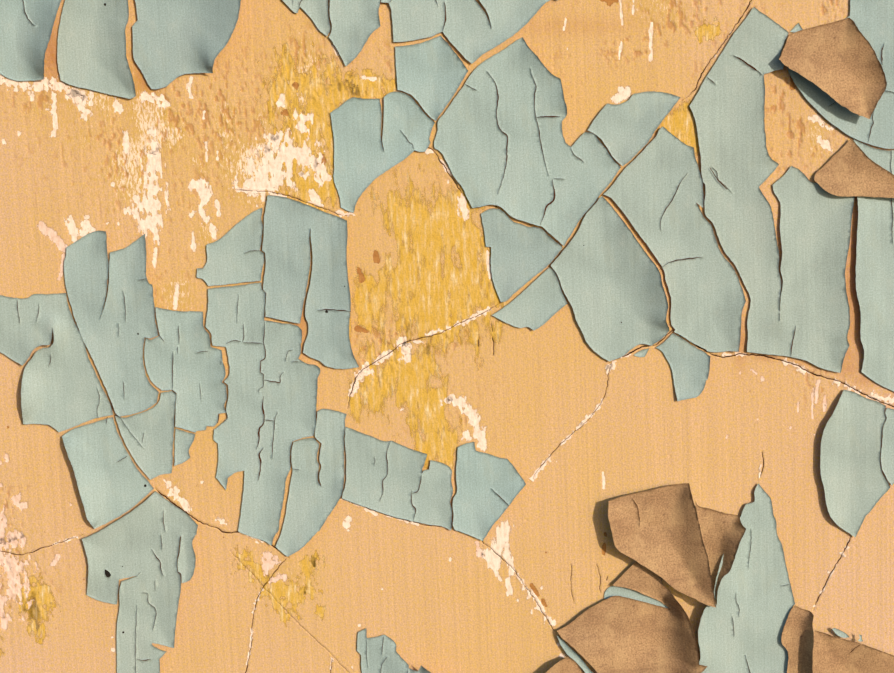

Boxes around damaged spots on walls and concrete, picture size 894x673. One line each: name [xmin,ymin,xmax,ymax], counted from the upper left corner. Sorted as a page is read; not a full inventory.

peeling [0,0,241,137]
peeling [330,7,855,401]
peeling [0,108,526,673]
crack [341,441,442,527]
crack [347,303,500,409]
crack [529,328,894,482]
peeling [811,380,894,537]
peeling [856,196,894,391]
water stain [9,573,60,644]
crack [152,488,386,673]
crack [479,539,556,633]
peeling [698,483,795,673]